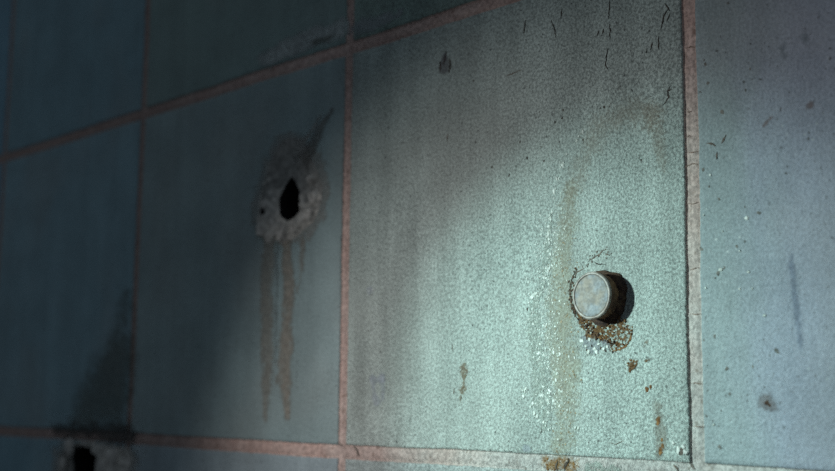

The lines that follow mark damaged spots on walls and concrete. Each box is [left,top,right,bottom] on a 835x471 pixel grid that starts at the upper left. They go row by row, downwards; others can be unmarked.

crack [597,0,611,69]
crack [646,4,670,53]
hole [251,115,330,246]
leakage [276,239,295,419]
corrosion [577,313,649,373]
corrosion [453,363,468,401]
hole [52,437,138,471]
corrosion [542,456,620,471]